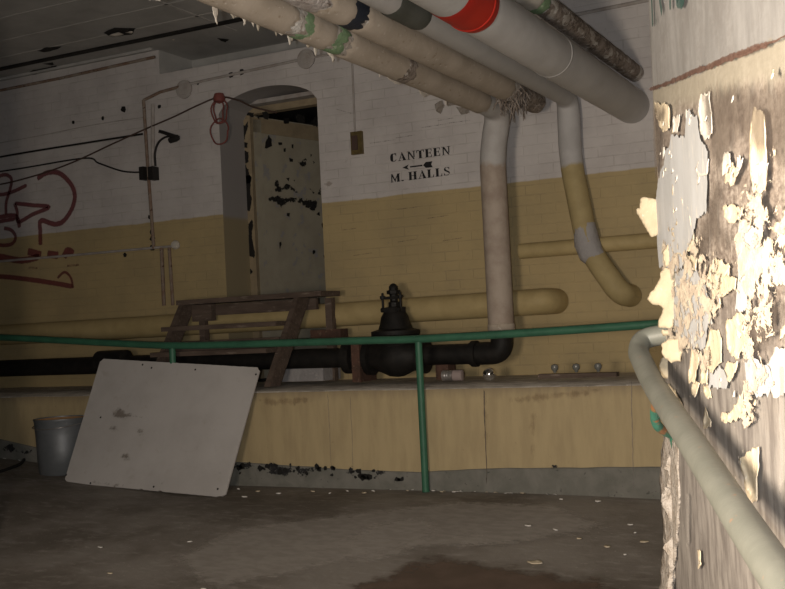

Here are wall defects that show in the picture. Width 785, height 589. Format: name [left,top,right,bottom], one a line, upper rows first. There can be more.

peeling [636,91,785,433]
peeling [735,447,759,503]